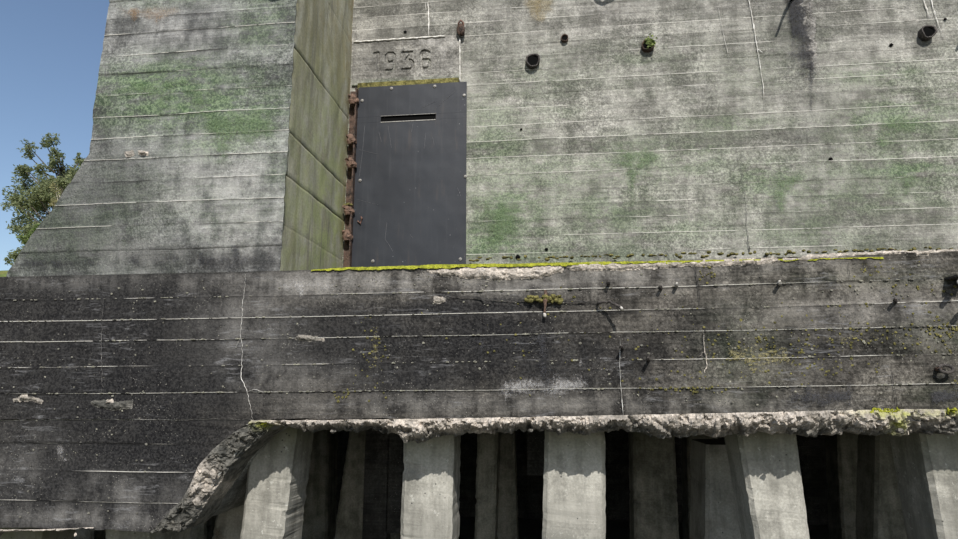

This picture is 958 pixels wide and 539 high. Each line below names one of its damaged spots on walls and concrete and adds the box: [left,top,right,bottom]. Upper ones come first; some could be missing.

crack [749,1,764,98]
damp [788,0,814,88]
spalling [151,409,958,533]